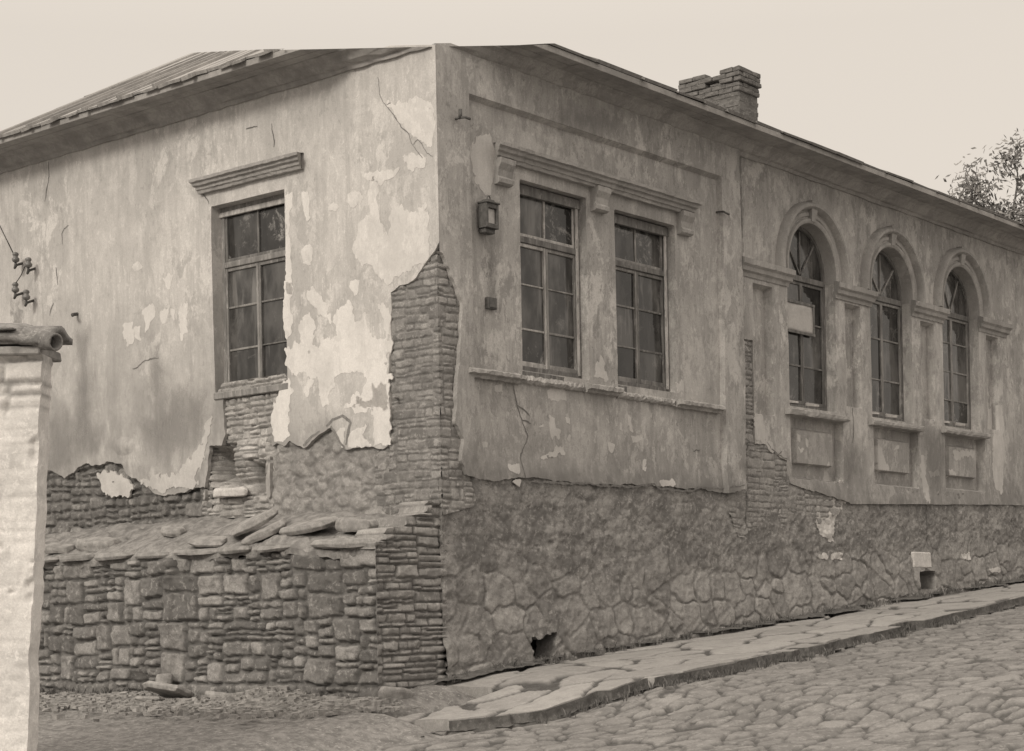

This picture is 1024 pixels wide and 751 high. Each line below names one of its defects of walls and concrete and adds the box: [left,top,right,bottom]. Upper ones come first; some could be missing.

crack [378,79,431,157]
peeling [470,133,495,196]
spalling [45,96,476,546]
crack [513,386,749,533]
spalling [722,340,841,537]